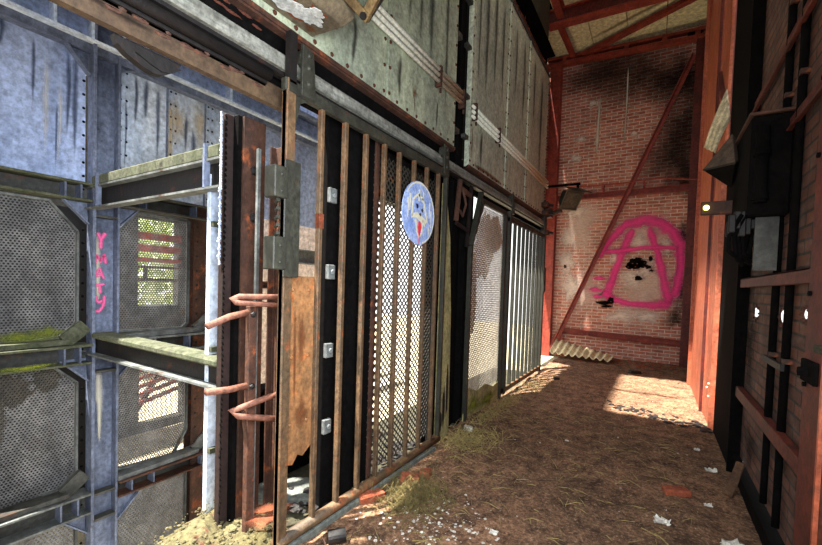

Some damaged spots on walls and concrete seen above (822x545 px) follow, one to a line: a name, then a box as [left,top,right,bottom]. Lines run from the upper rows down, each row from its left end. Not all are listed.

peeling [272,0,327,28]
damp [67,61,77,142]
damp [125,82,148,152]